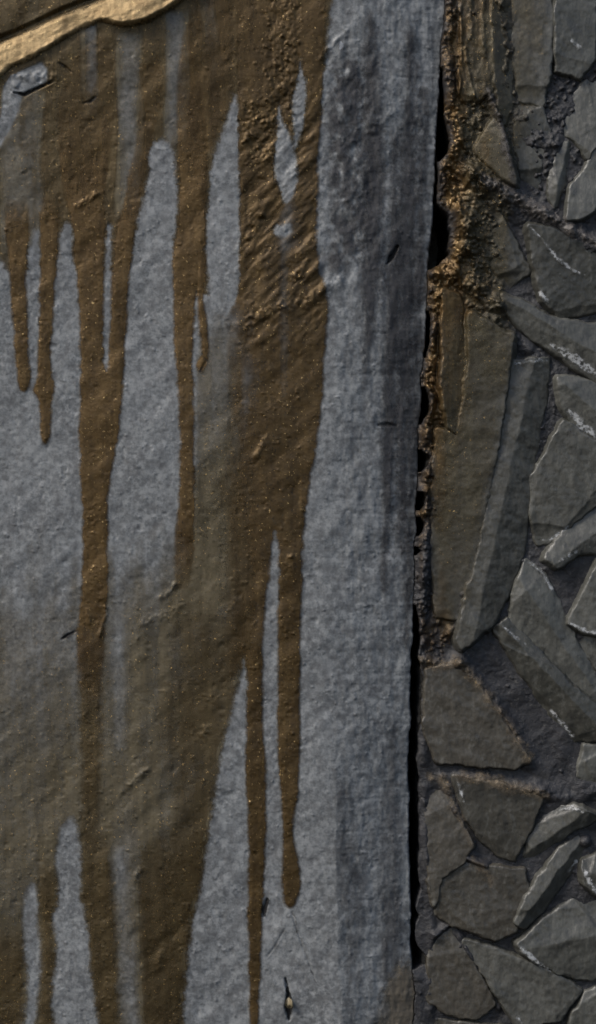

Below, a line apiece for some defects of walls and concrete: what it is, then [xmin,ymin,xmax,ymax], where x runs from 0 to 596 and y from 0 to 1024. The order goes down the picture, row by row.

crack [432,74,448,266]
crack [422,315,430,354]
crack [419,390,428,424]
crack [414,452,429,554]
crack [408,605,426,964]